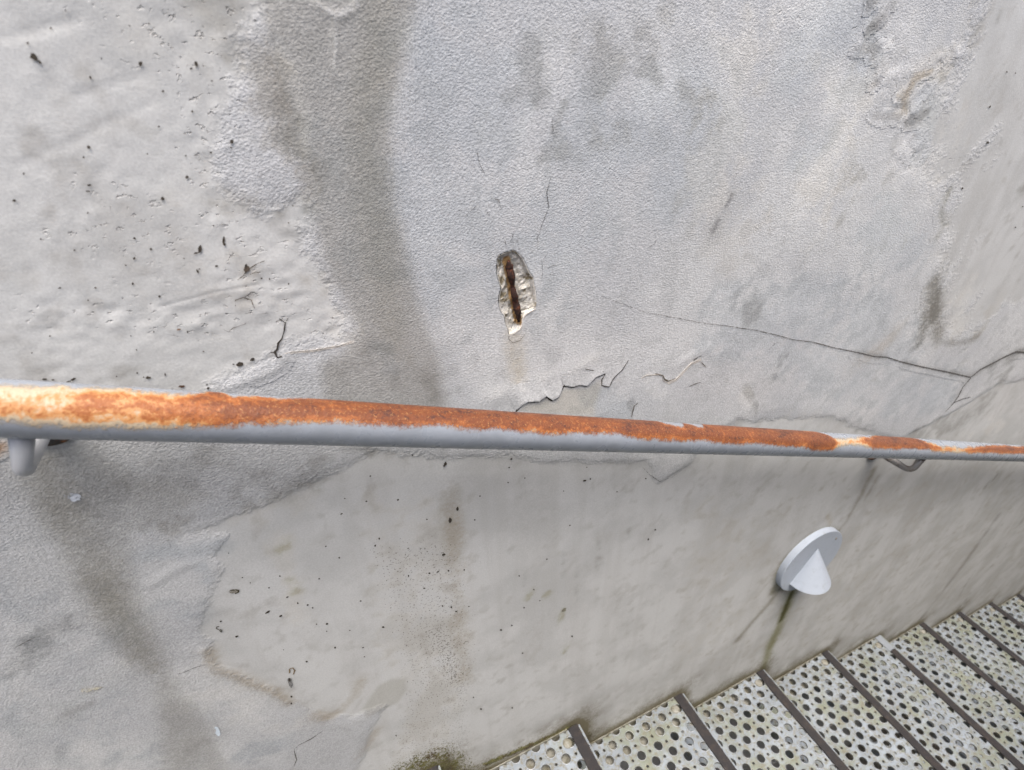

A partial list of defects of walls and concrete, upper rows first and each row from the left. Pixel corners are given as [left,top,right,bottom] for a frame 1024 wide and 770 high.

spalling [497,250,537,343]
crack [271,318,288,358]
peeling [507,354,629,417]
peeling [641,356,706,387]
crack [610,299,1024,412]
leakage [775,589,797,626]